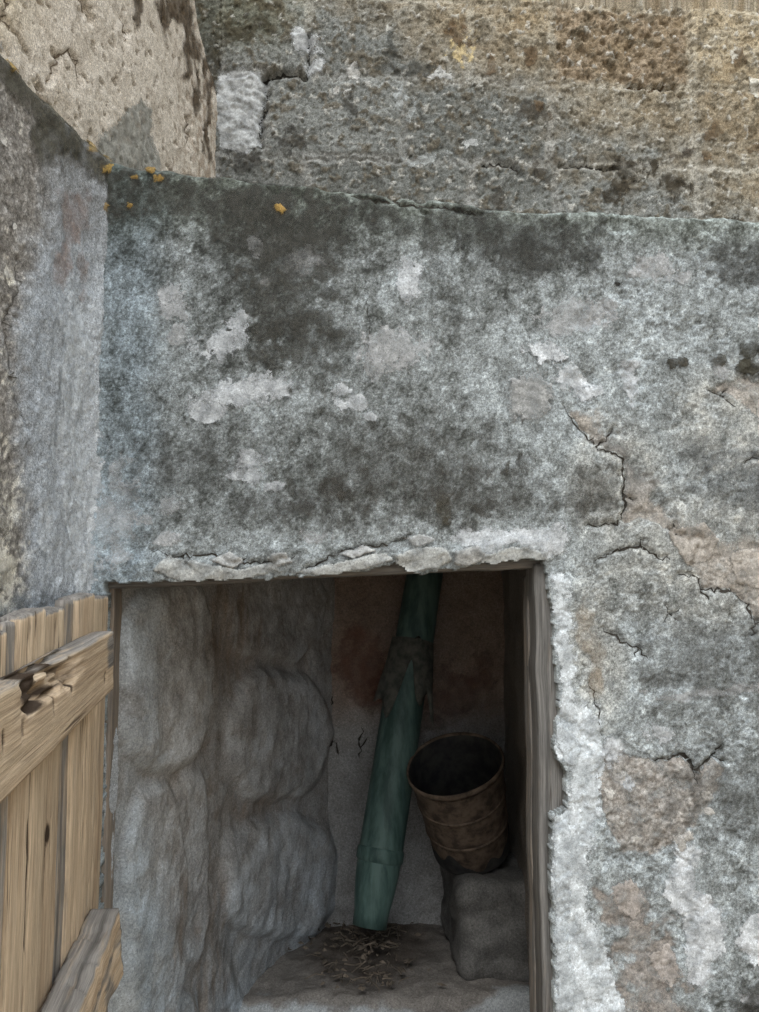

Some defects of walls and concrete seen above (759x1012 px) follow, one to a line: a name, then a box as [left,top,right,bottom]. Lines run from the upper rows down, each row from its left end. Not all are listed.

leakage [158,184,432,424]
leakage [520,298,603,402]
leakage [225,449,285,492]
crack [151,534,411,577]
leakage [500,453,530,476]
crack [564,406,759,636]
spalling [569,411,759,619]
crack [603,628,648,659]
crack [588,676,604,735]
spalling [596,753,725,855]
crack [654,745,724,784]
flaking render [592,877,694,1012]